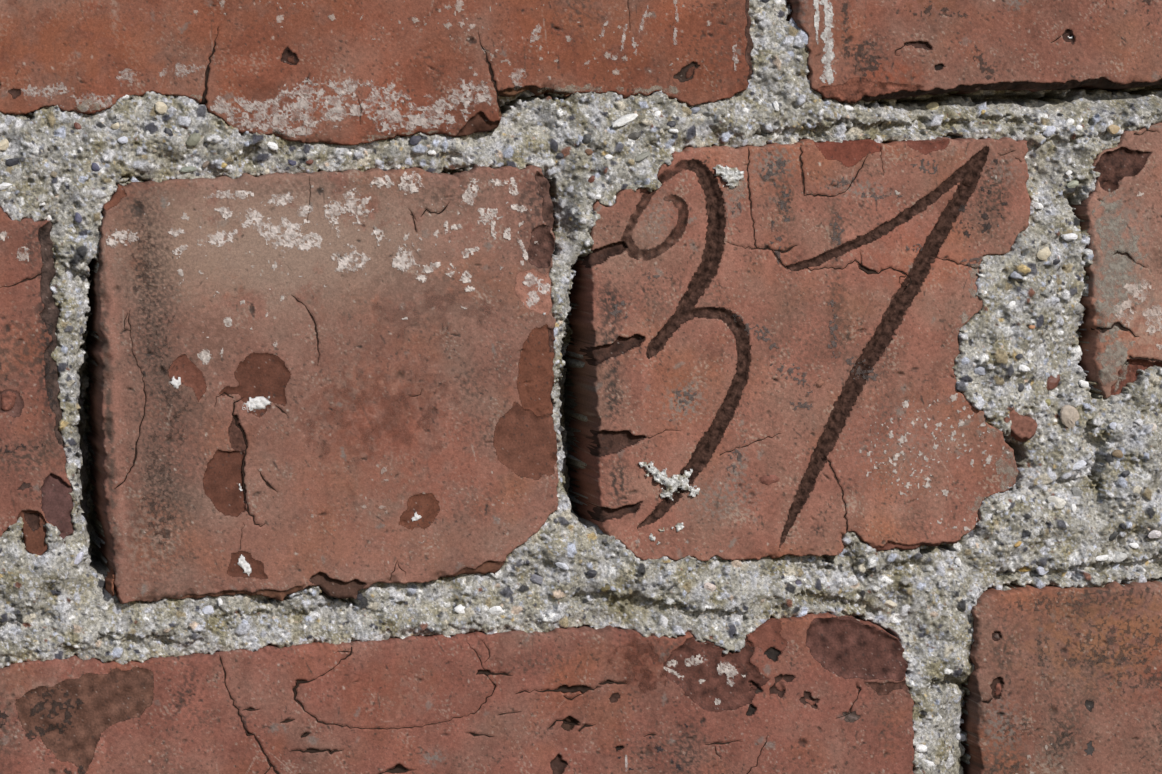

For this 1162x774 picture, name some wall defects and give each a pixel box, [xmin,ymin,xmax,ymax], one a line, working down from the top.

leakage [195,66,492,141]
spalling [1093,147,1152,192]
leakage [106,229,138,246]
leakage [168,171,550,308]
crack [726,147,912,289]
leakage [197,332,223,364]
spalling [493,171,558,480]
spalling [167,352,291,517]
spalling [17,473,74,555]
crack [220,657,279,774]
crack [293,640,496,729]
spalling [806,616,911,696]